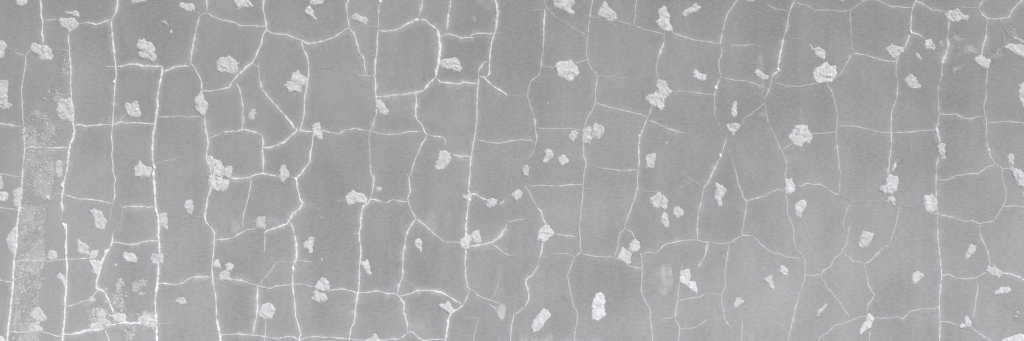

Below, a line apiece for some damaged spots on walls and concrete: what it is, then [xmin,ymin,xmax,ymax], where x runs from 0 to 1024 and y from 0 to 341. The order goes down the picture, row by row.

spalling [136,38,157,62]
spalling [554,60,579,82]
spalling [809,44,837,84]
spalling [645,79,672,111]
spalling [788,125,812,147]
spalling [207,154,233,191]
crack [0,0,691,341]
crack [617,0,1023,341]
spalling [879,160,899,206]
spalling [679,269,698,295]
spalling [531,308,551,333]
spalling [591,292,606,321]